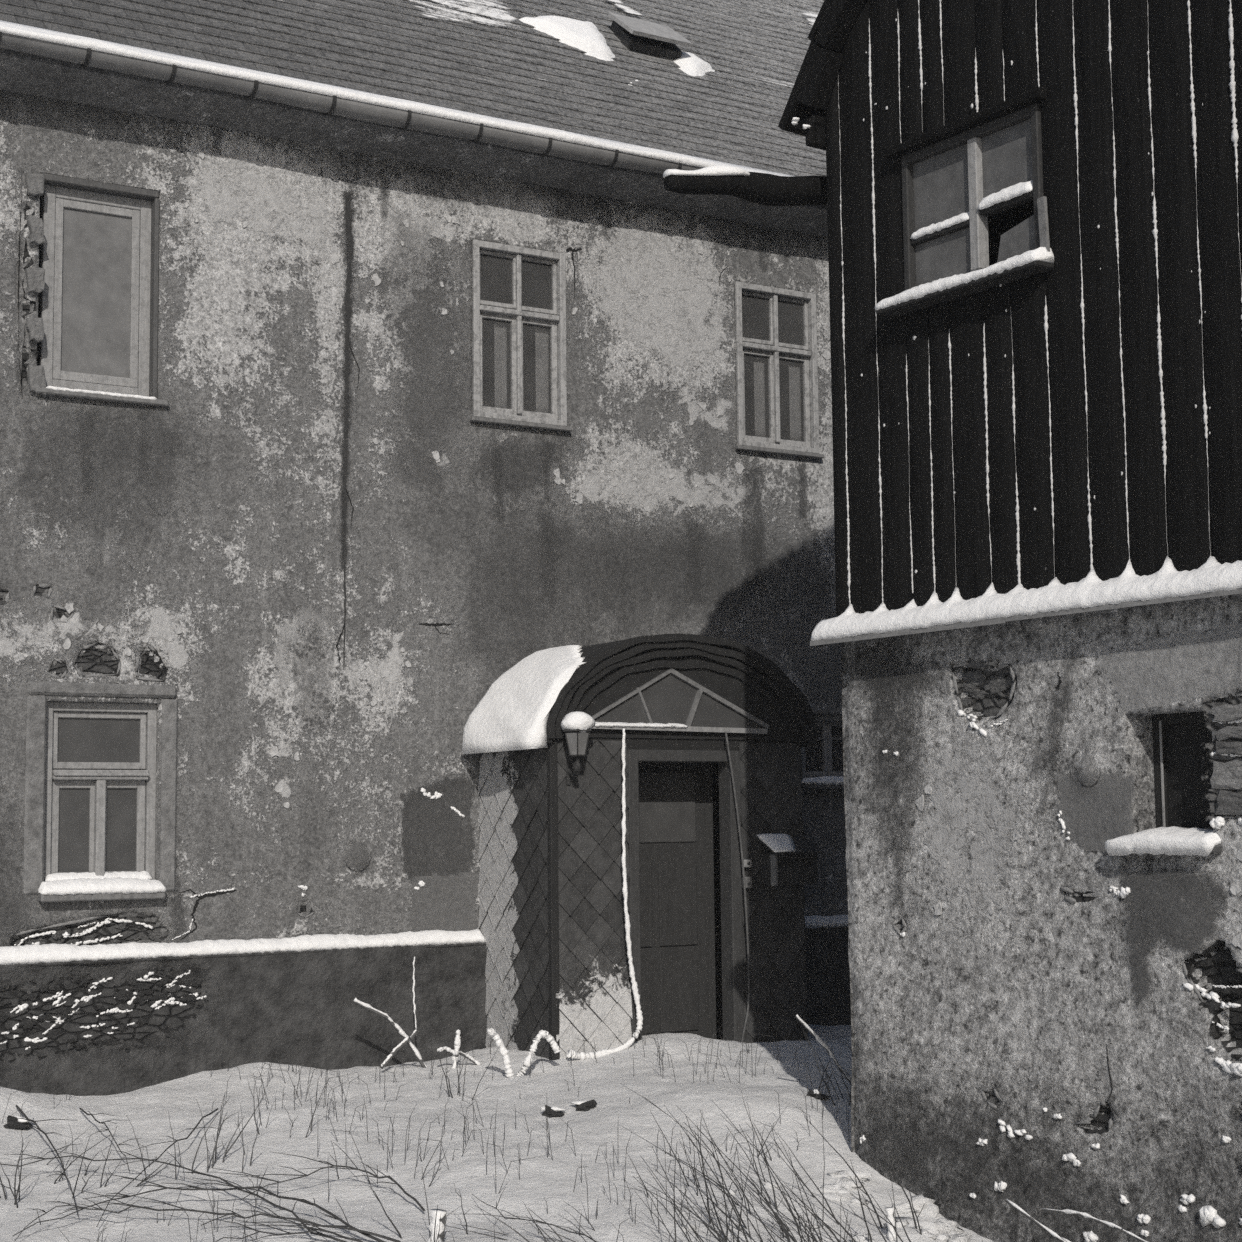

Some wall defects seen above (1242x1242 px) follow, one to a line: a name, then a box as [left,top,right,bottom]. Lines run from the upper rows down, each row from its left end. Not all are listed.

crack [336,192,360,668]
peeling [0,584,189,682]
peeling [906,659,1022,920]
flaking render [1201,687,1242,823]
leakage [1121,869,1227,1001]
flaking render [1182,917,1242,1061]
peeling [1230,882,1242,899]